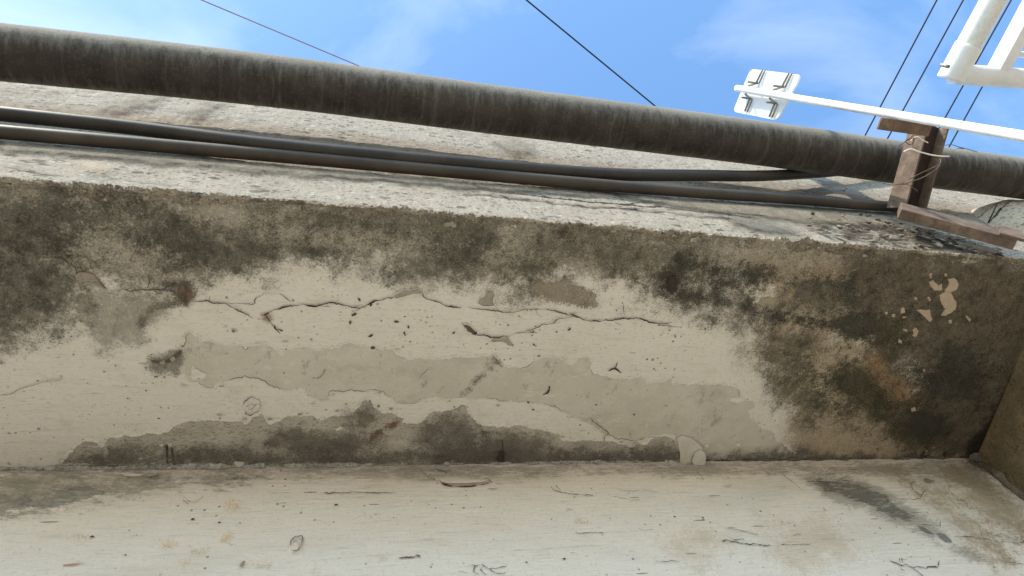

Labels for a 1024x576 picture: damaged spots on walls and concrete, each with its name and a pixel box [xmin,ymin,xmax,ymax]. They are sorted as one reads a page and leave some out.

water stain [1,140,598,196]
crack [64,259,394,344]
peeling [59,330,799,487]
spalling [0,176,1024,344]
water stain [0,182,1024,488]
crack [422,294,736,338]